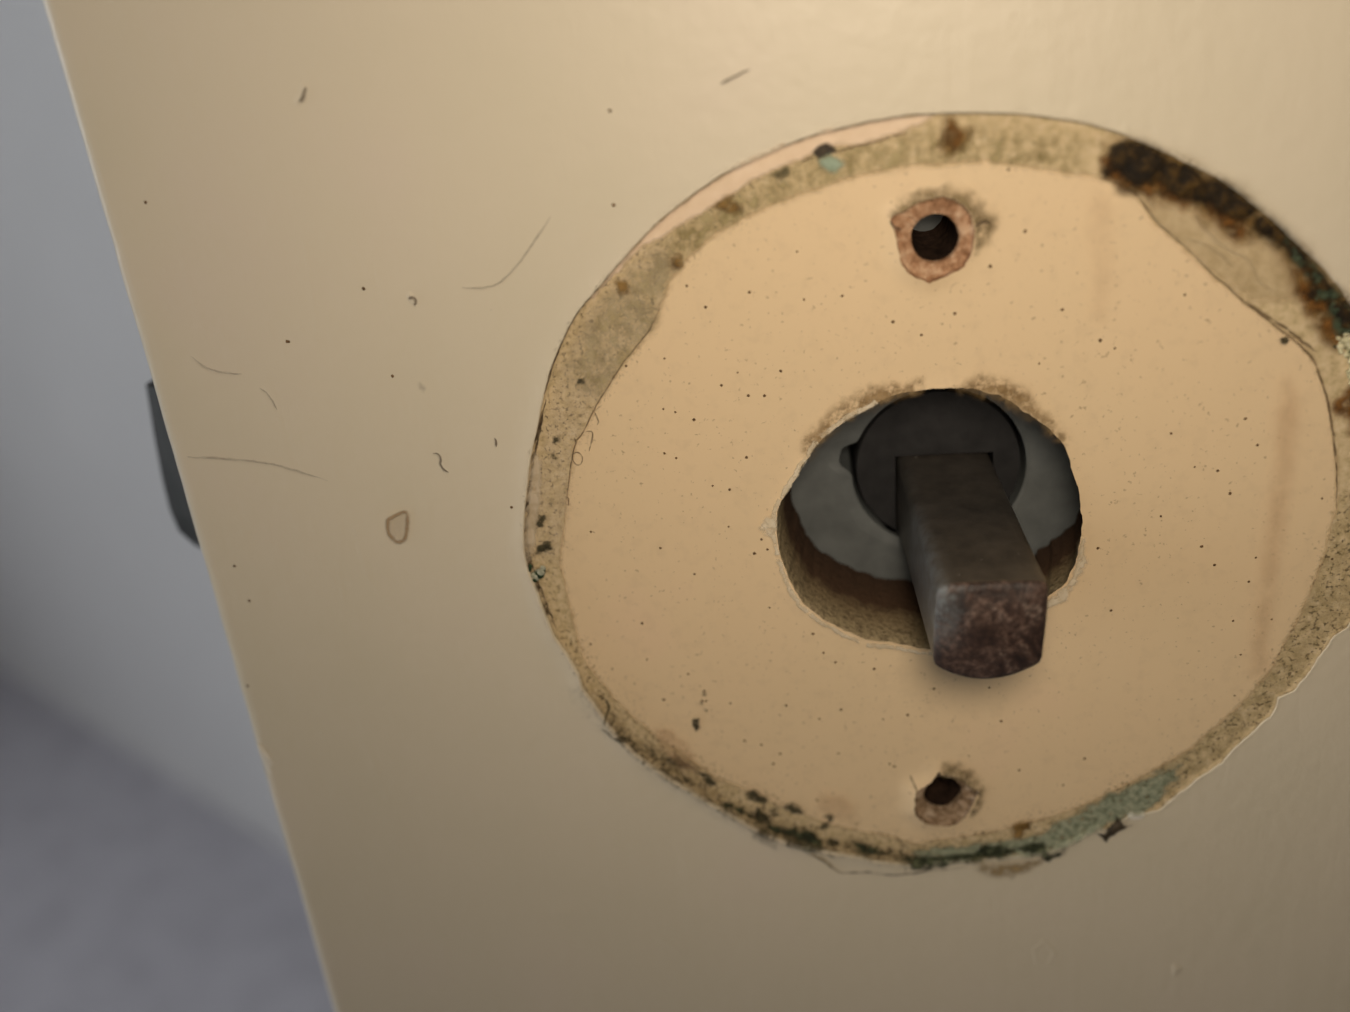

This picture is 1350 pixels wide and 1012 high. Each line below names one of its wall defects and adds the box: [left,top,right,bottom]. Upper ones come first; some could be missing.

leakage [598,695,1177,870]